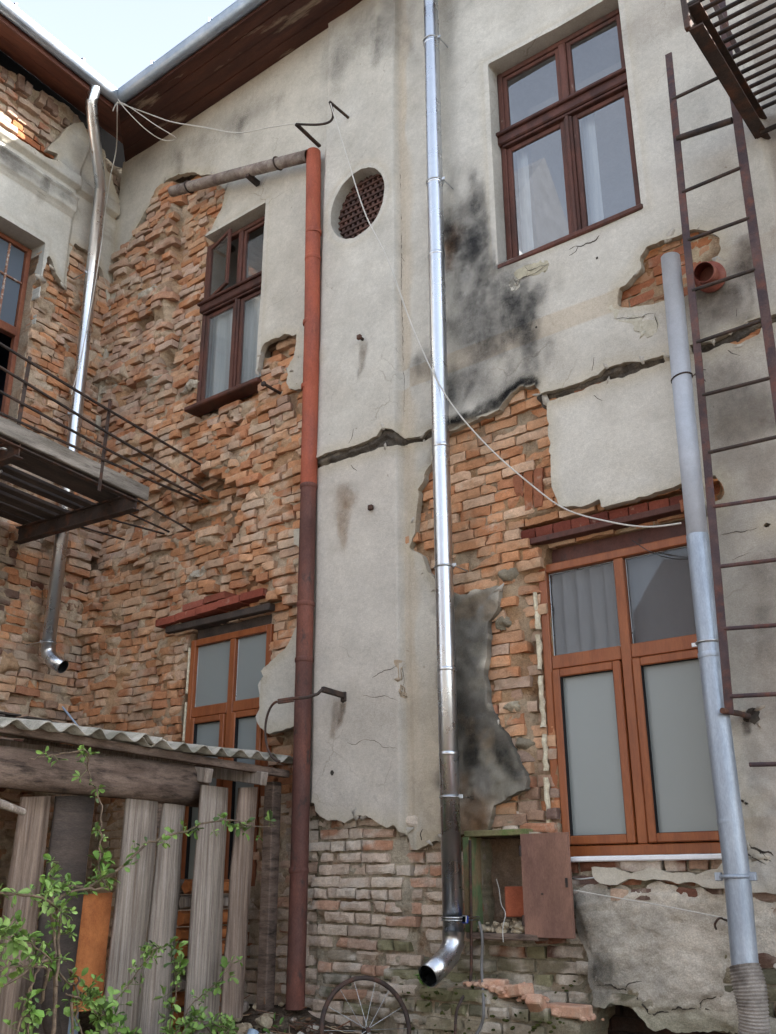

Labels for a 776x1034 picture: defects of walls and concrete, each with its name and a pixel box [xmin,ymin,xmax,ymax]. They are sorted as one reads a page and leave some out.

spalling [0,66,88,159]
crack [317,217,432,470]
water stain [445,195,487,260]
crack [532,310,776,410]
spalling [609,225,727,338]
spalling [0,170,303,743]
spalling [405,470,435,578]
spalling [449,388,685,926]
spalling [0,788,74,929]
spalling [84,797,125,988]
spalling [305,805,653,1034]
spalling [571,860,725,901]